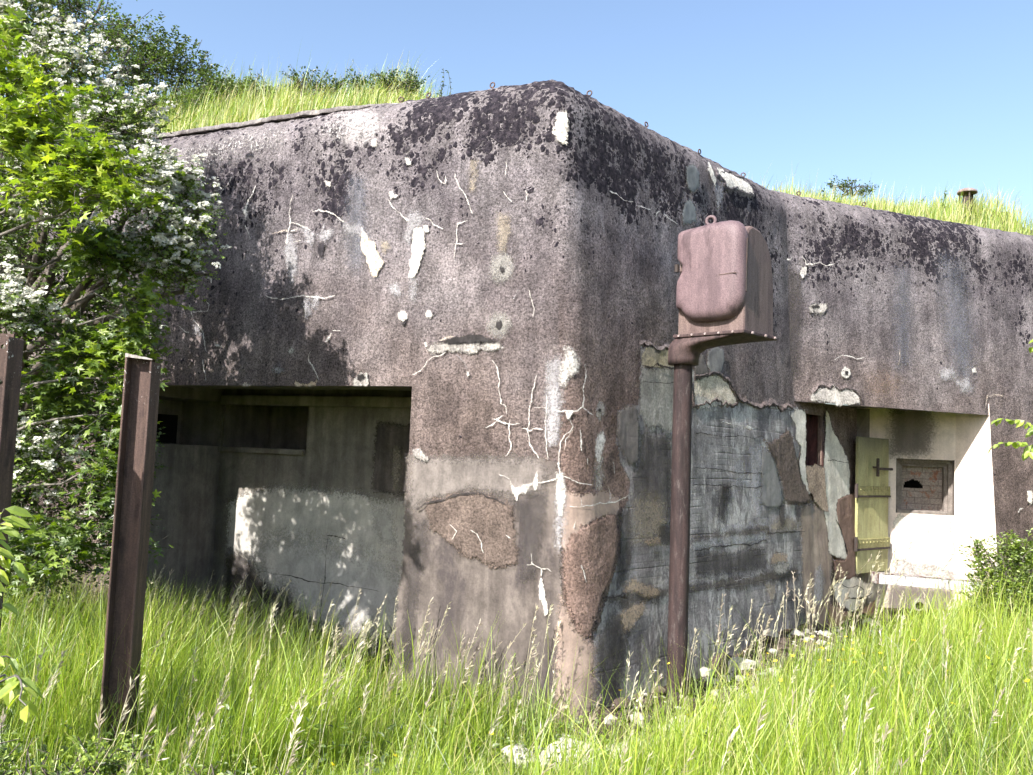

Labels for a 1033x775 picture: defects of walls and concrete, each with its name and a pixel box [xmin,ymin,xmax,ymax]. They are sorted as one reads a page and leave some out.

water stain [181,128,290,167]
water stain [316,108,383,147]
spalling [551,110,569,145]
crack [212,174,256,240]
crack [266,195,344,317]
spalling [360,227,387,277]
spalling [406,213,429,300]
spalling [424,334,503,355]
crack [486,360,593,501]
peeling [253,340,674,737]
peeling [687,369,876,679]
crack [530,556,552,616]